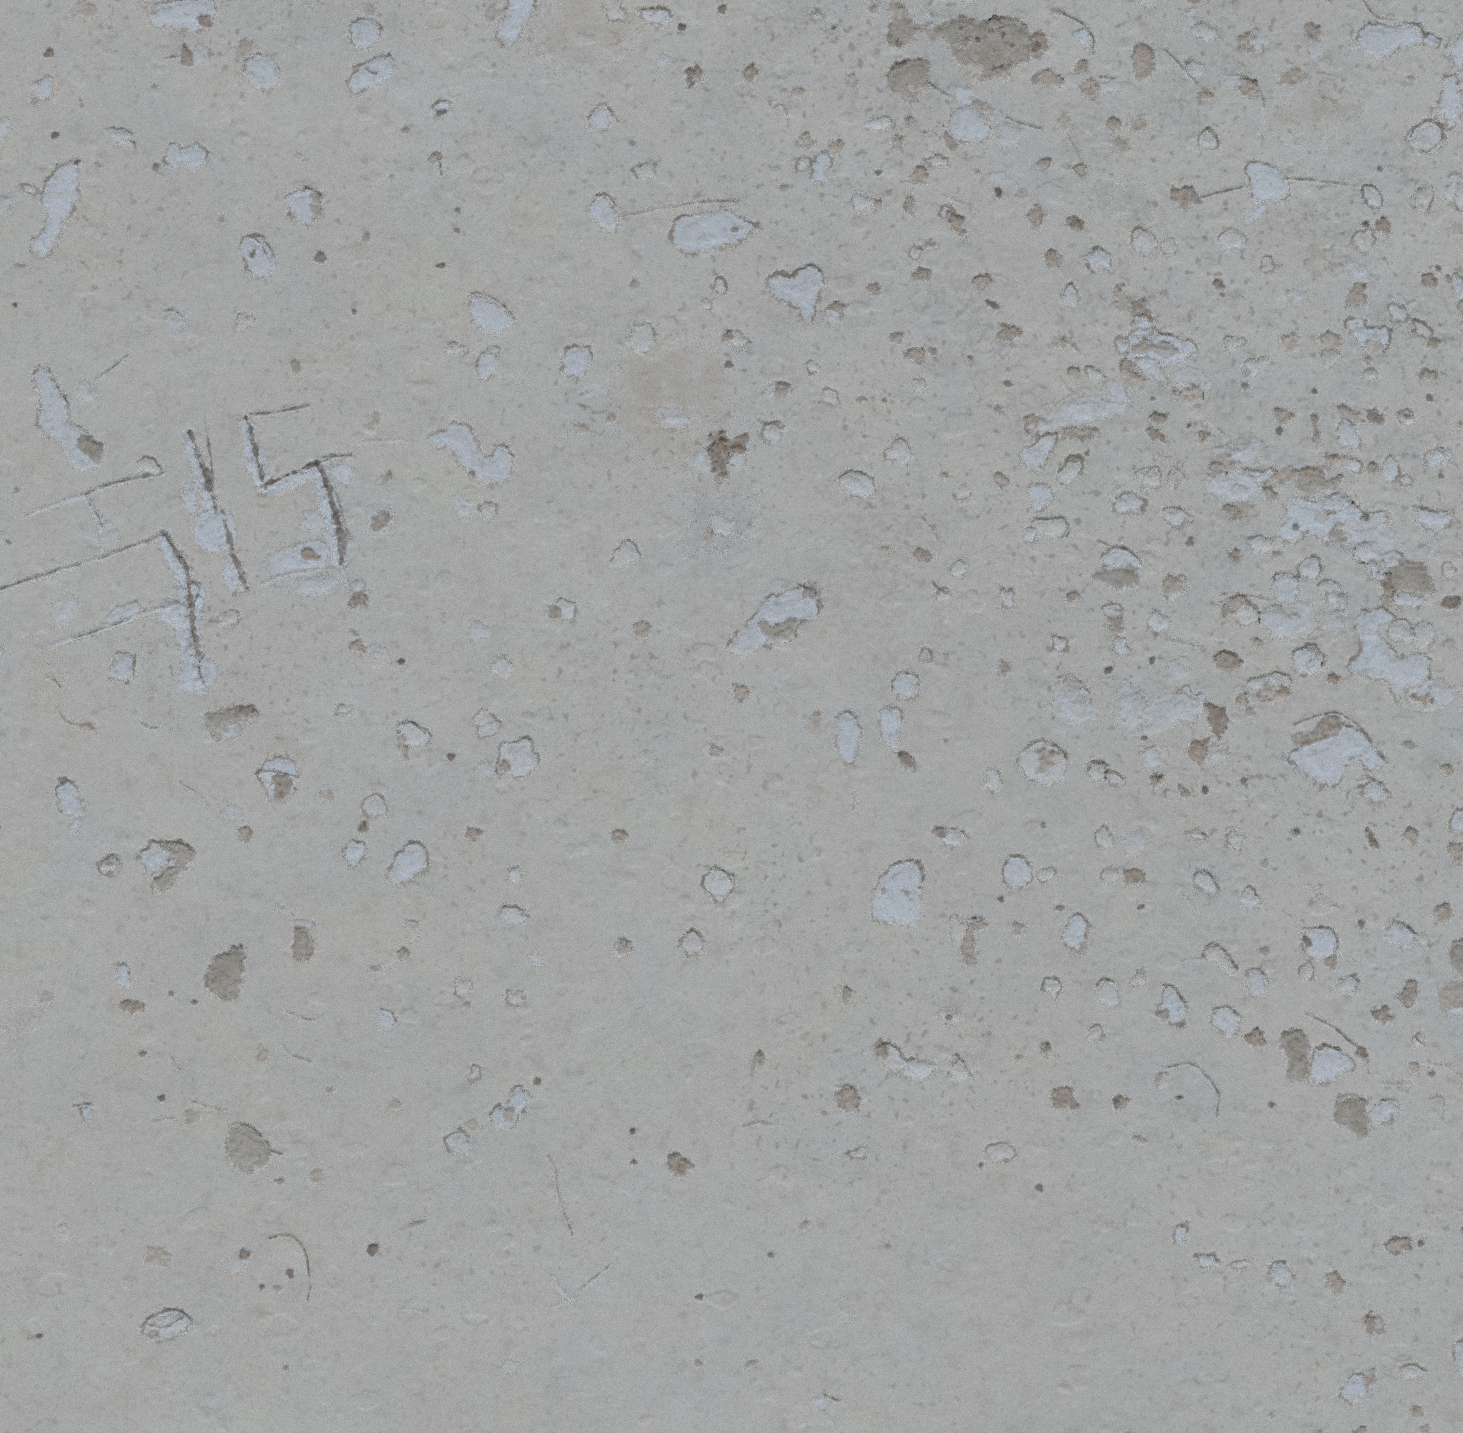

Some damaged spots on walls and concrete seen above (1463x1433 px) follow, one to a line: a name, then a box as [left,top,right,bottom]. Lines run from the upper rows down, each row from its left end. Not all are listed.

spalling [868,0,1156,153]
peeling [29,157,83,258]
peeling [668,200,761,257]
spalling [1065,215,1085,232]
peeling [764,263,847,325]
peeling [1318,282,1393,367]
peeling [990,283,1214,513]
peeling [726,581,826,657]
peeling [1286,711,1391,807]
peeling [870,859,927,926]
spalling [202,944,247,1001]
spalling [224,1123,284,1175]